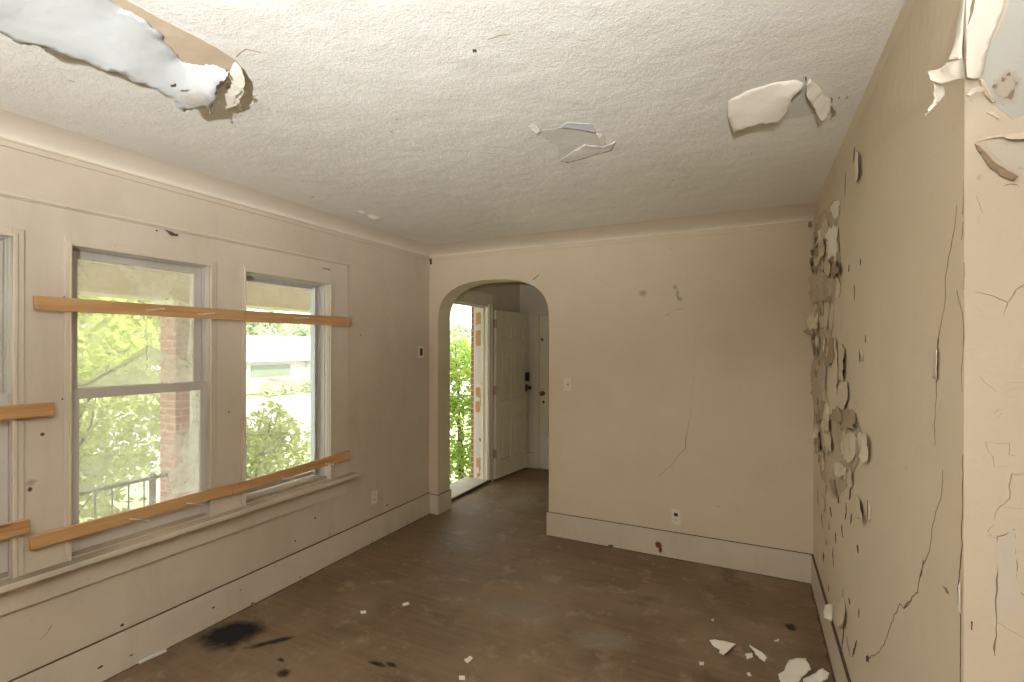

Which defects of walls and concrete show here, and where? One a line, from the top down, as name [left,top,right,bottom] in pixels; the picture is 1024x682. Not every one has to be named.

peeling [0,0,260,115]
peeling [529,122,616,163]
peeling [728,76,848,134]
peeling [924,0,1024,119]
peeling [974,132,1024,186]
peeling [803,199,871,567]
crack [985,441,1024,538]
crack [866,455,964,682]